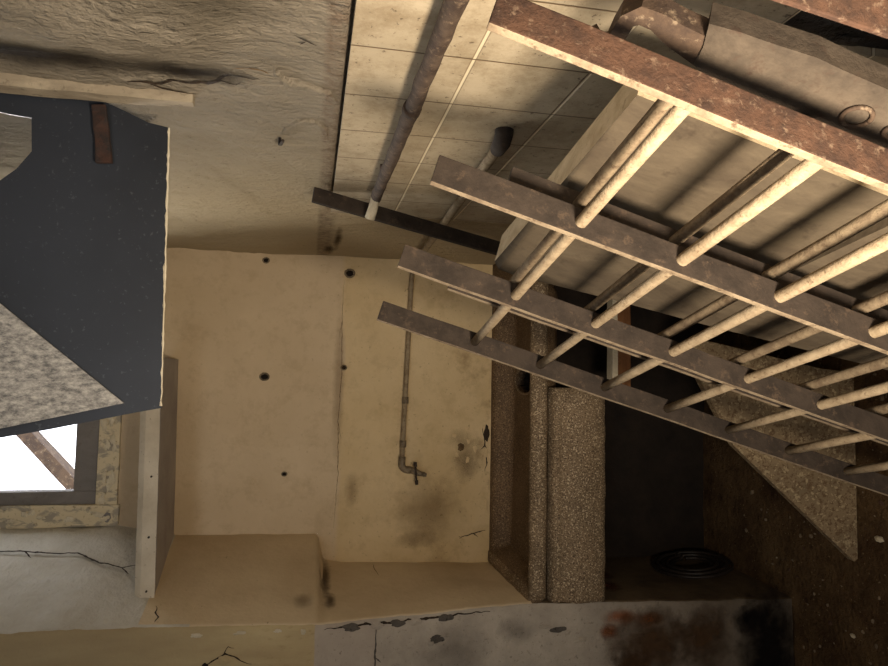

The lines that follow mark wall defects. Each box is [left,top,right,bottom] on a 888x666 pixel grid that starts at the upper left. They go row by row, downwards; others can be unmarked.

rust [771,0,888,39]
crack [0,550,135,574]
crack [202,646,248,666]
leakage [613,612,723,666]
leakage [738,595,795,666]